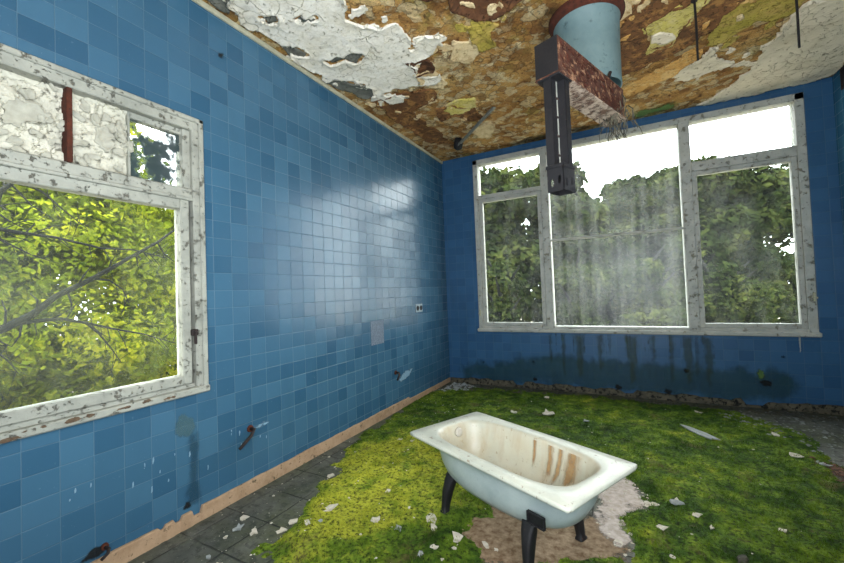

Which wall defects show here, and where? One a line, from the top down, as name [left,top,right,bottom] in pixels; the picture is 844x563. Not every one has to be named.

peeling [207,0,522,144]
corrosion [559,38,625,114]
peeling [620,0,844,106]